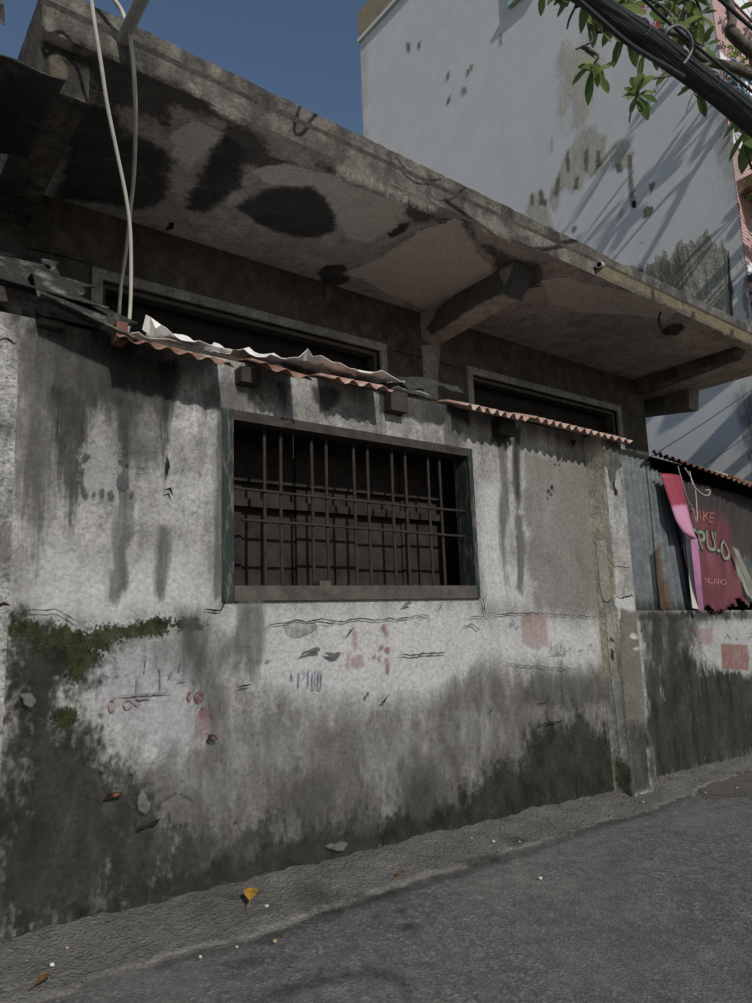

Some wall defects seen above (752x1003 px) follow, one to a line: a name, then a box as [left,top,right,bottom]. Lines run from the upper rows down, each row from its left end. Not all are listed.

damp [55,35,293,212]
damp [236,186,336,238]
peeling [528,127,632,229]
damp [596,266,752,345]
peeling [629,229,752,325]
damp [17,335,87,530]
damp [110,490,134,602]
damp [157,526,169,597]
crack [265,602,443,628]
crack [464,595,633,630]
damp [620,609,752,798]
damp [0,606,614,938]